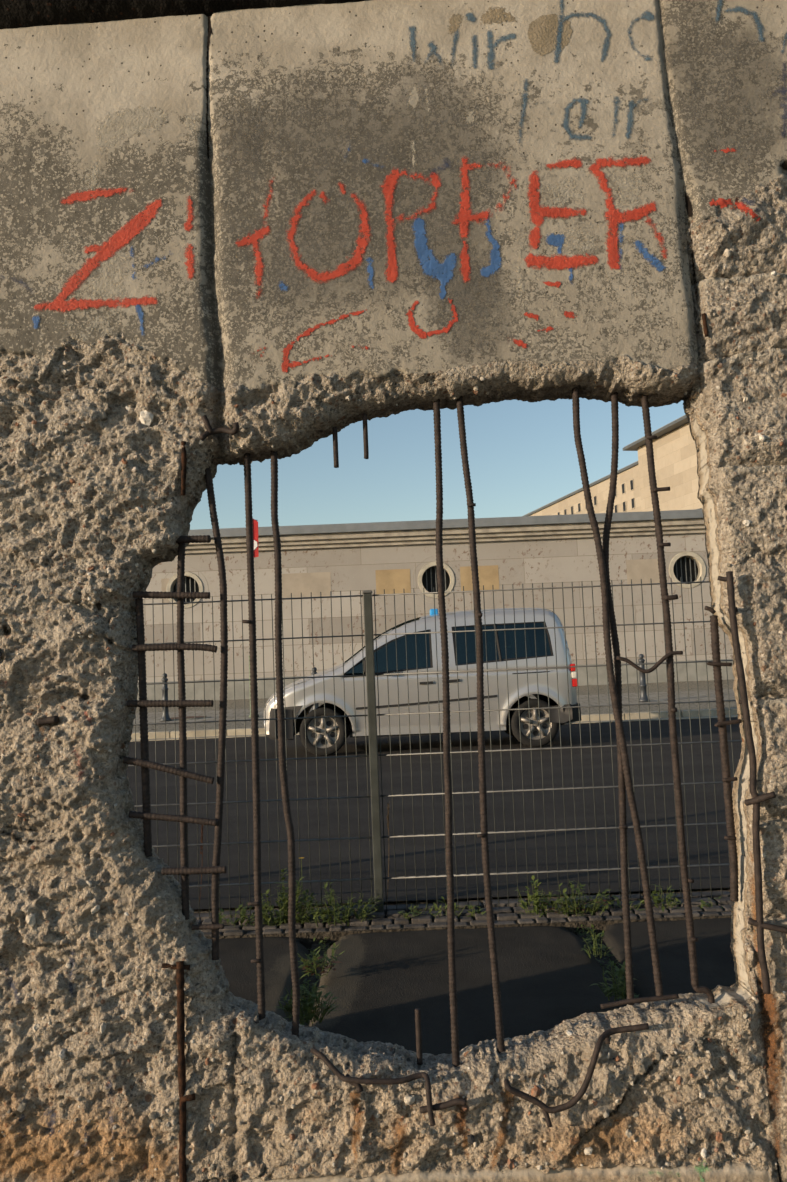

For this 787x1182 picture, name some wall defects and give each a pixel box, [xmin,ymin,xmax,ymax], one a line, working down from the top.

peeling [480,7,573,56]
crack [205,16,213,159]
peeling [409,86,430,112]
spalling [0,315,787,1182]
rust [751,878,782,1109]
rust [455,1096,468,1155]
rust [491,1090,514,1168]
crack [562,1053,674,1154]